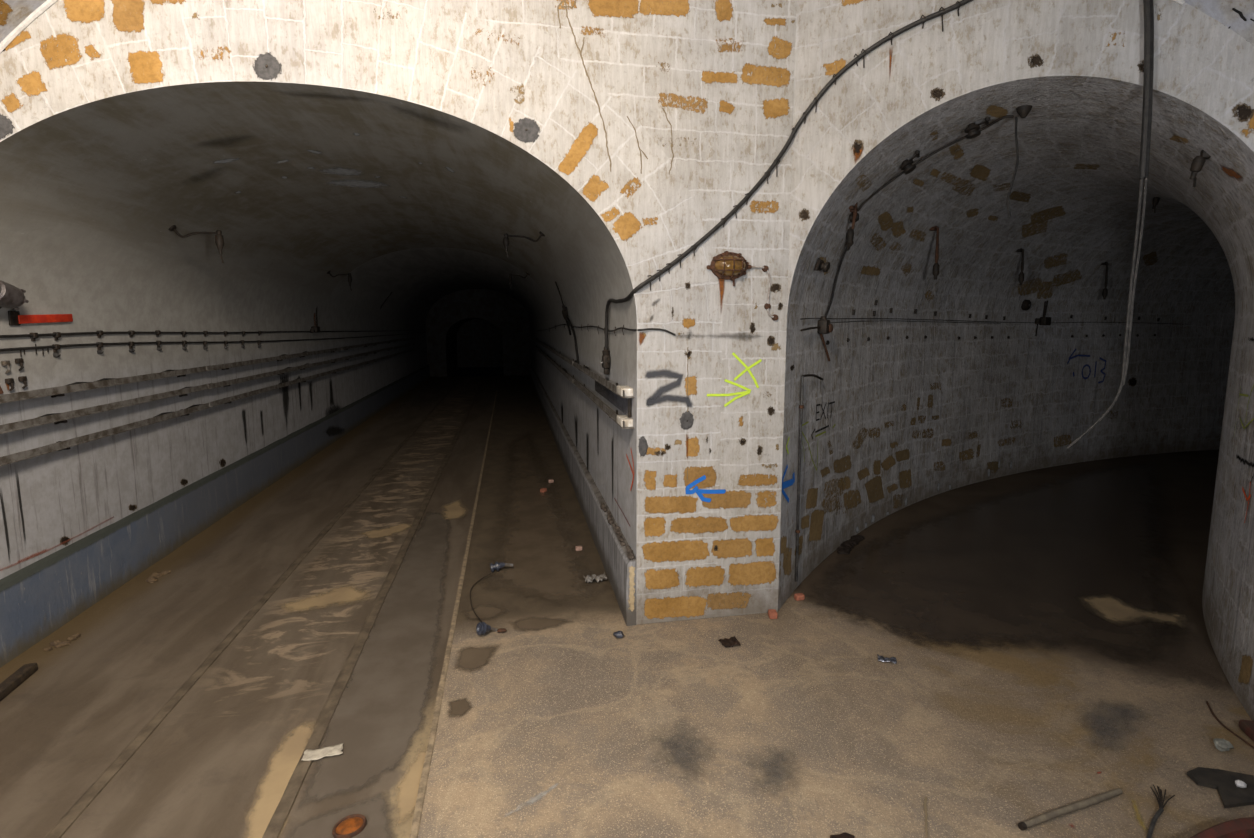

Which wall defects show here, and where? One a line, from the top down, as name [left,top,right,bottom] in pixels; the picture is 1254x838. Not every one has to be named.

crack [557,0,674,174]
peeling [913,143,1066,237]
peeling [870,206,926,275]
peeling [767,336,781,351]
damp [0,473,26,559]
peeling [628,383,999,619]
peeling [1238,655,1253,685]